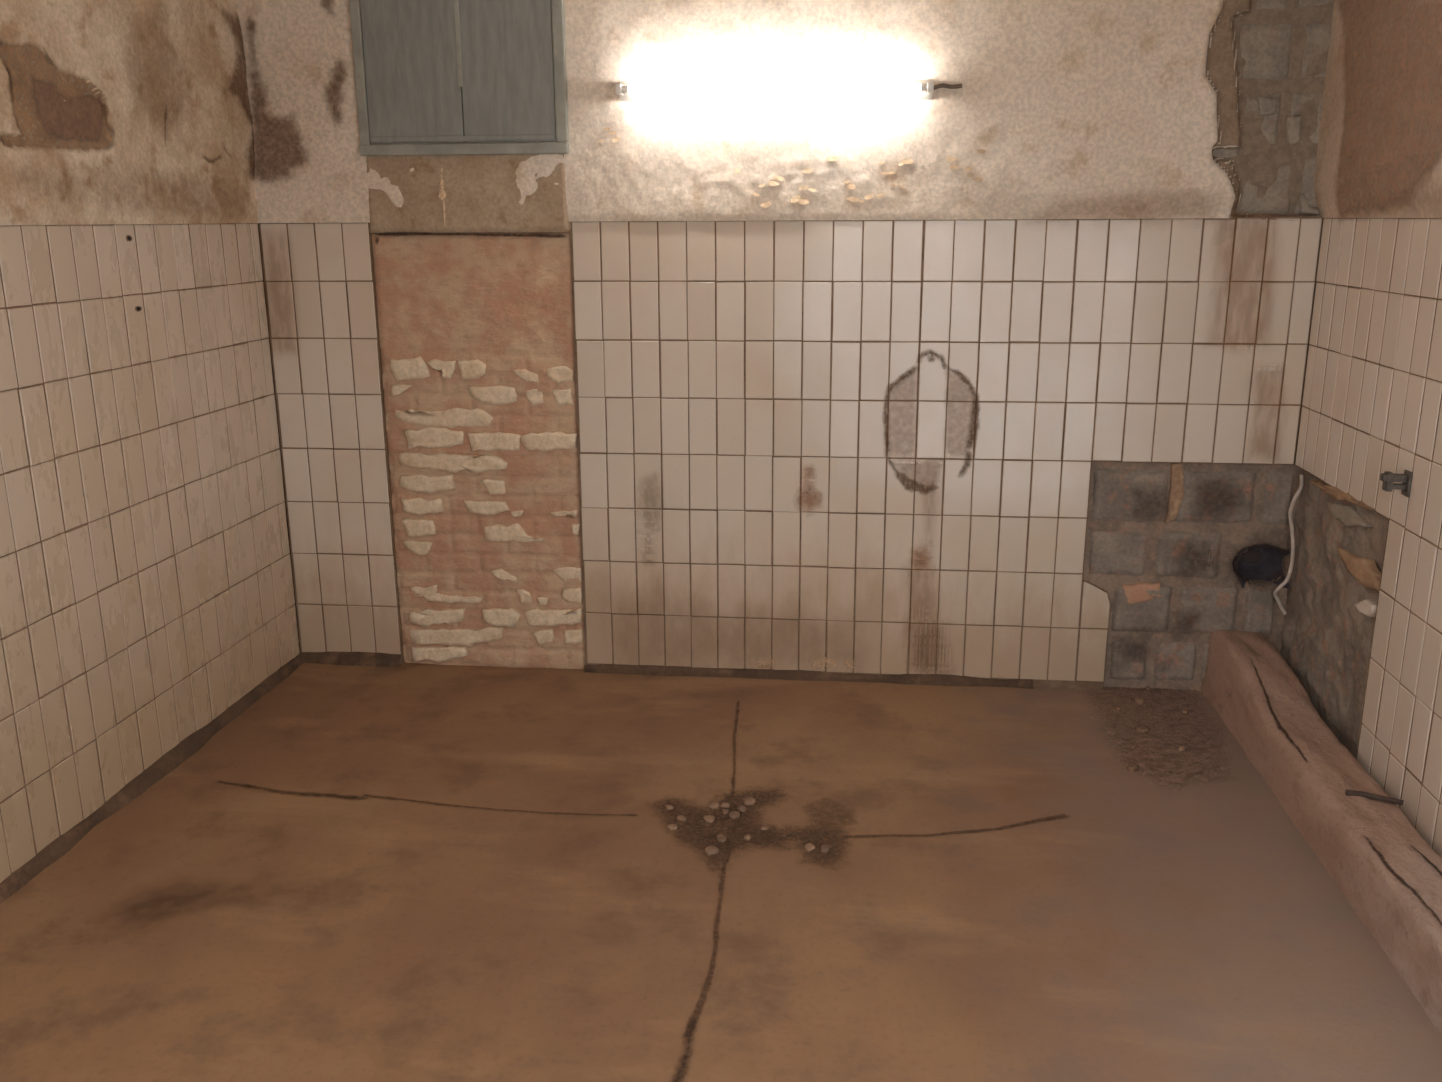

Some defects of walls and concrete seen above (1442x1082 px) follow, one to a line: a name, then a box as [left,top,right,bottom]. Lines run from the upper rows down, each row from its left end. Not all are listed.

spalling [0,43,114,151]
spalling [1206,0,1334,219]
peeling [753,168,816,208]
peeling [843,159,913,203]
peeling [390,356,580,556]
peeling [409,567,583,662]
spalling [1083,461,1389,759]
crack [1251,659,1307,761]
crack [221,781,637,816]
crack [844,815,1067,838]
crack [673,703,739,1082]
crack [1365,837,1442,925]